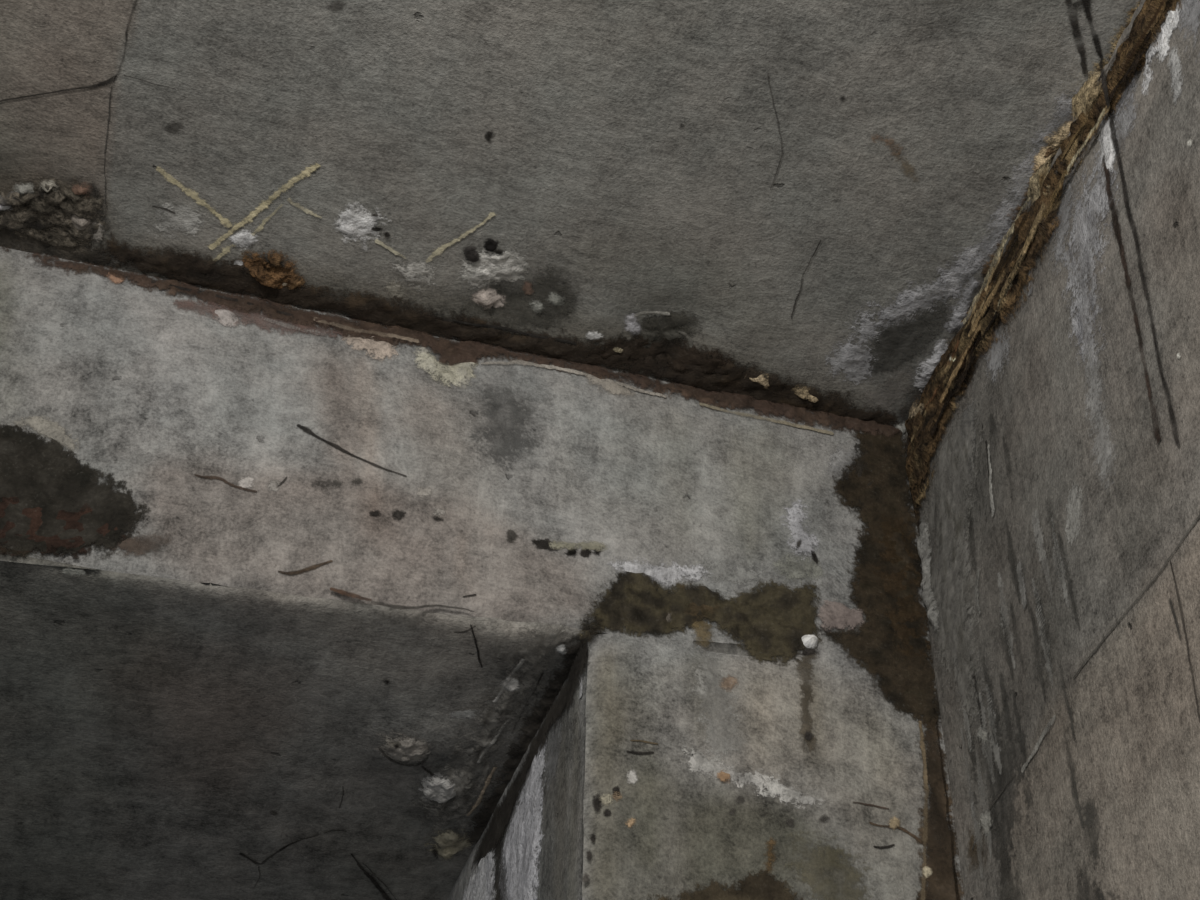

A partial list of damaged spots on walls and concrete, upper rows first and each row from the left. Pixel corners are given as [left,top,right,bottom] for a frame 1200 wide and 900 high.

crack [0,75,175,208]
spalling [0,178,105,249]
water stain [148,203,206,238]
rust [234,250,305,290]
water stain [334,202,390,251]
water stain [825,0,1200,517]
crack [1066,0,1179,445]
water stain [0,230,964,900]
water stain [1032,484,1082,630]